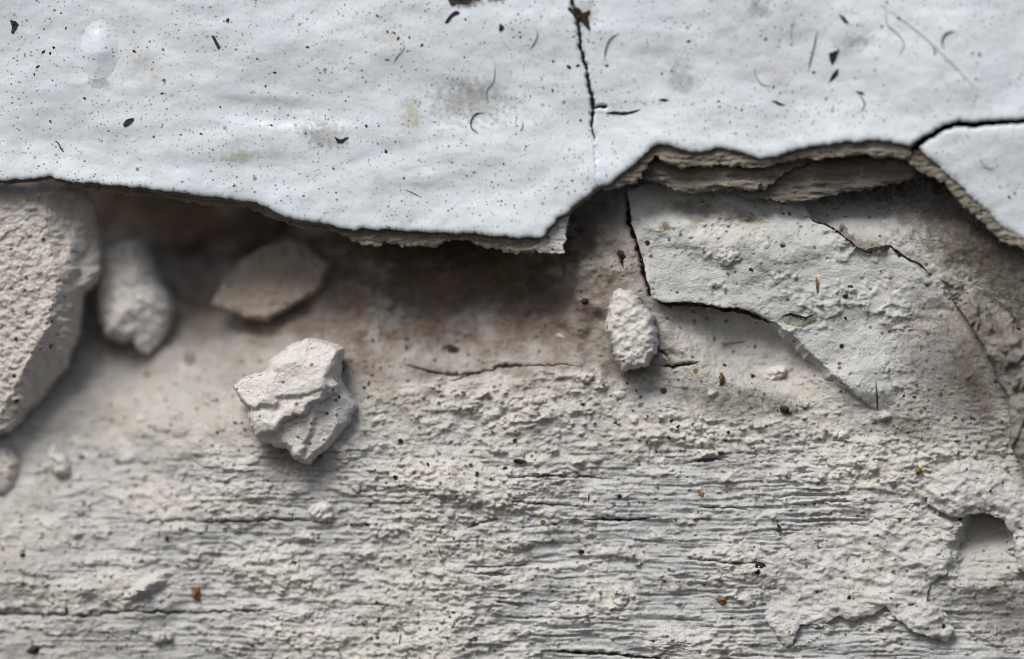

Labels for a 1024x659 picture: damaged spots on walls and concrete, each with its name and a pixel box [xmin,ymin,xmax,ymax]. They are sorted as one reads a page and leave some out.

crack [569,0,640,148]
peeling [0,0,1024,321]
crack [911,119,1024,152]
crack [617,192,816,324]
crack [799,205,931,276]
peeling [781,313,817,327]
crack [397,362,582,381]
crack [657,349,699,369]